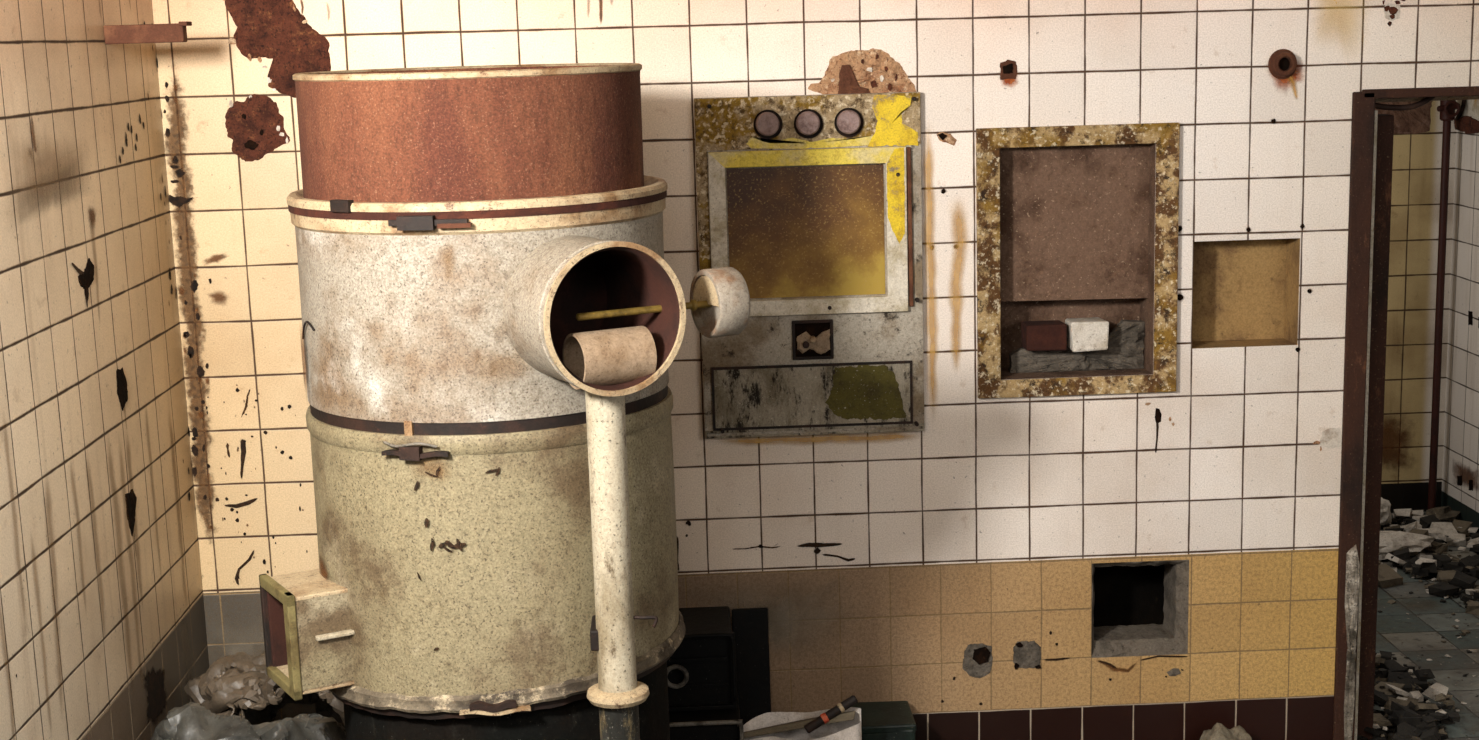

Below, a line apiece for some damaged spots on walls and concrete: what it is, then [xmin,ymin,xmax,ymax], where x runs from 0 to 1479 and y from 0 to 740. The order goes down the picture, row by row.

spalling [223,0,331,162]
spalling [808,48,916,94]
corrosion [1276,65,1300,98]
spalling [72,258,94,308]
spalling [962,643,993,678]
spalling [1013,641,1041,670]